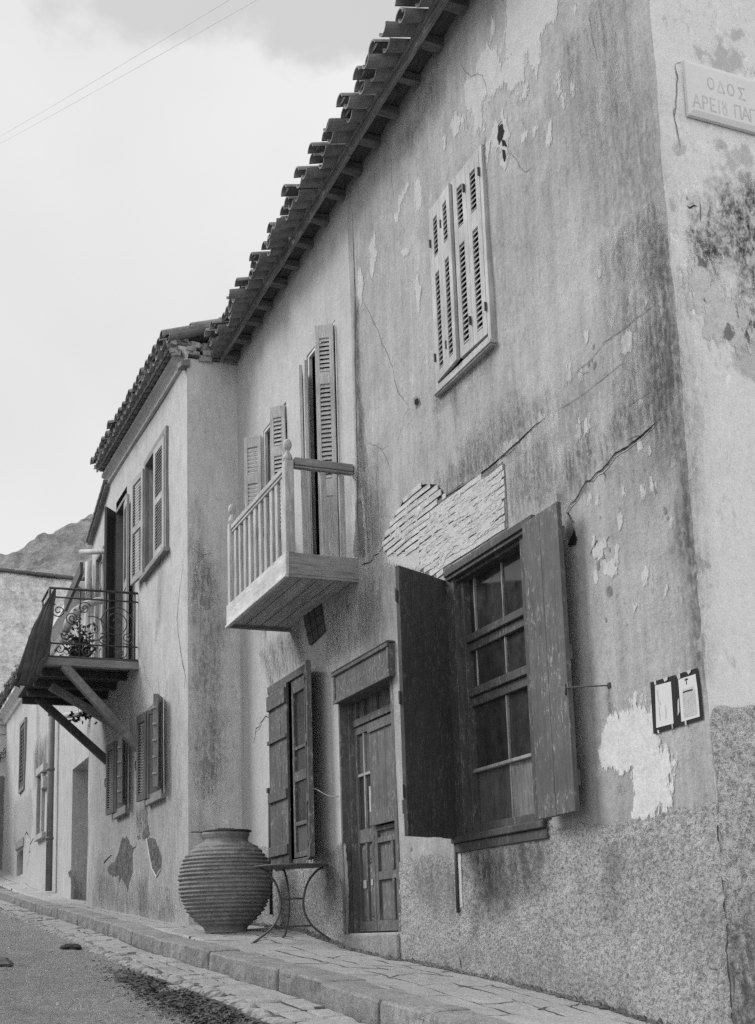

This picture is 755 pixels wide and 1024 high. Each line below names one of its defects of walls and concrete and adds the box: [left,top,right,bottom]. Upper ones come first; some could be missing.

peeling [442,0,558,171]
crack [672,62,680,143]
water stain [692,183,755,291]
crack [446,301,657,497]
spalling [382,436,519,578]
crack [566,417,662,522]
peeling [640,477,657,500]
peeling [592,535,620,597]
peeling [598,691,677,821]
spalling [107,825,162,892]